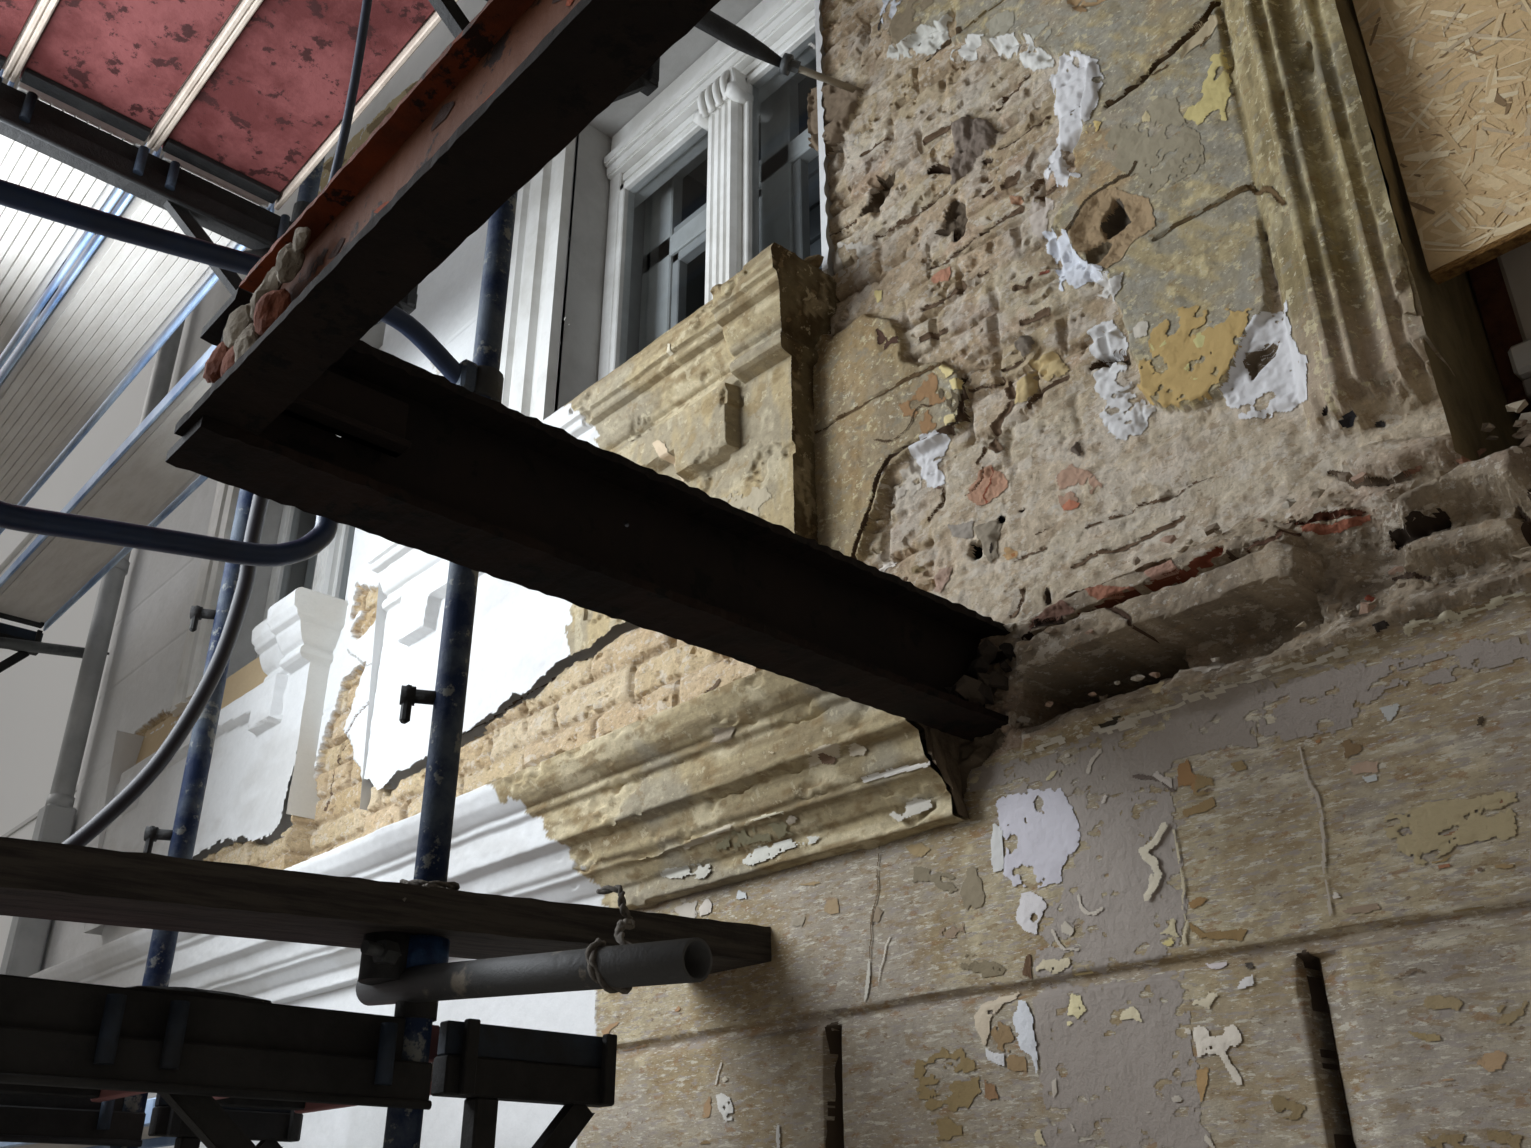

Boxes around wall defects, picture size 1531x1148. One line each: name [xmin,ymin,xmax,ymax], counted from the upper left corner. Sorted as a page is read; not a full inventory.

crack [927,0,1004,61]
crack [1105,1,1221,108]
peeling [1180,14,1232,125]
spalling [1069,187,1155,269]
crack [1157,184,1285,240]
crack [814,74,1137,559]
spalling [1243,341,1280,380]
crack [990,477,1301,664]
peeling [660,811,783,879]
peeling [743,836,819,866]
peeling [889,798,932,822]
peeling [969,633,1531,1148]